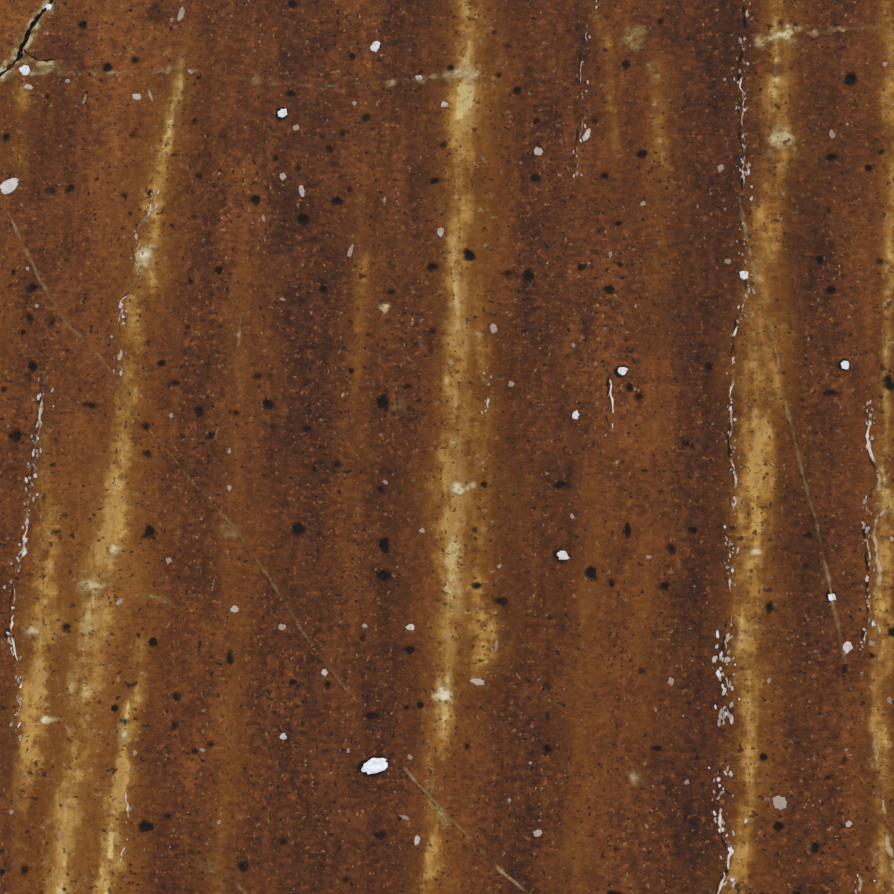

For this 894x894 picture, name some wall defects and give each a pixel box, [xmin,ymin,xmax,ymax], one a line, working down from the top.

crack [0,0,55,82]
rust [12,52,190,894]
rust [355,253,369,342]
rust [419,0,511,894]
rust [649,64,671,170]
rust [721,0,798,894]
rust [860,0,894,894]